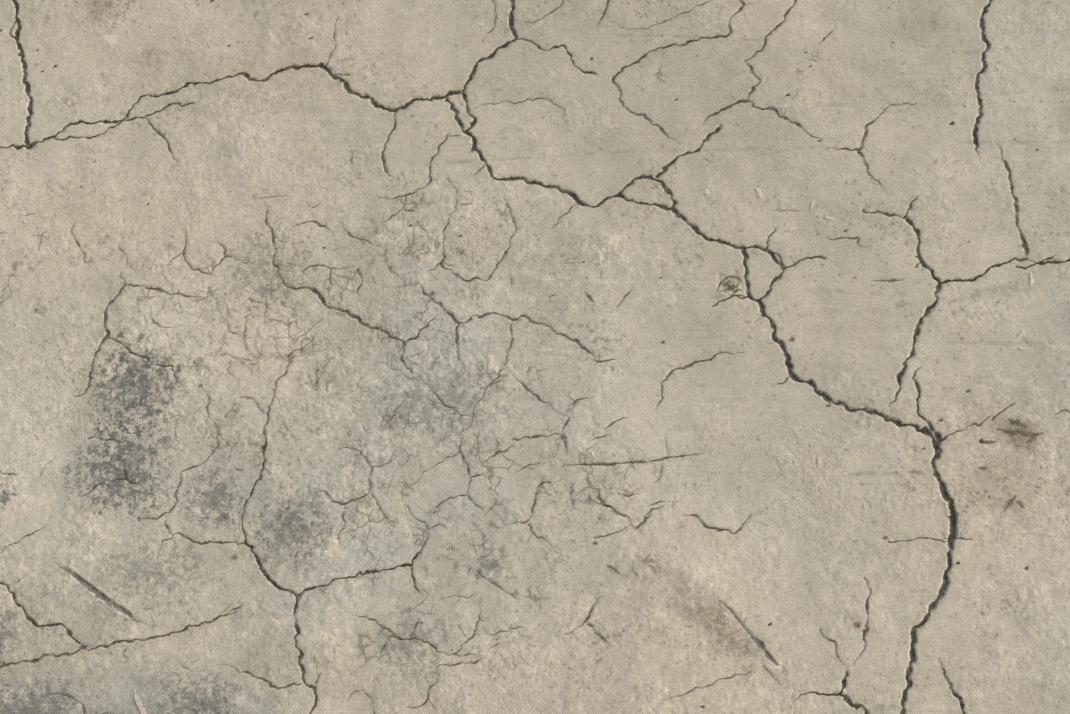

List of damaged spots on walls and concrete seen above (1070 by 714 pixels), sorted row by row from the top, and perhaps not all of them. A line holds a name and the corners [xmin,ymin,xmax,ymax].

crack [0,0,460,176]
crack [973,0,992,160]
crack [83,436,147,496]
crack [76,246,283,397]
crack [134,203,665,714]
crack [378,133,459,220]
crack [431,177,517,282]
crack [445,0,972,714]
crack [863,144,1070,406]
crack [968,402,1015,426]
crack [0,582,244,668]
crack [47,692,114,714]